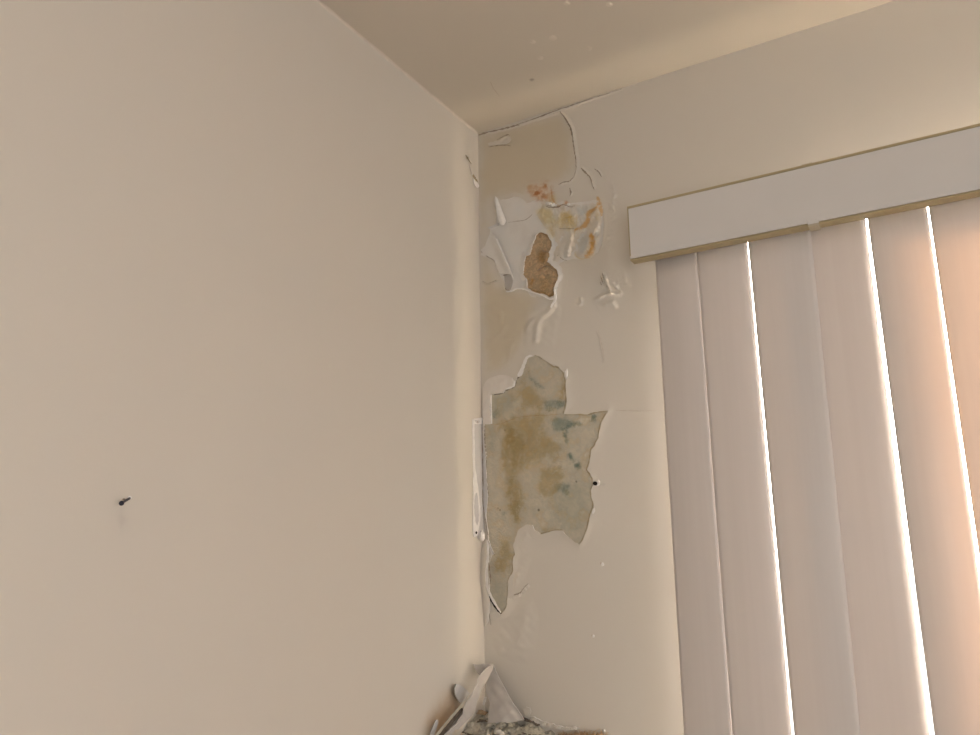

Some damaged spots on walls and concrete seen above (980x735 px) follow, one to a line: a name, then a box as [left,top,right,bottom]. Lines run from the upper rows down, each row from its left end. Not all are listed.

crack [479,89,623,197]
peeling [465,154,612,308]
peeling [480,346,621,627]